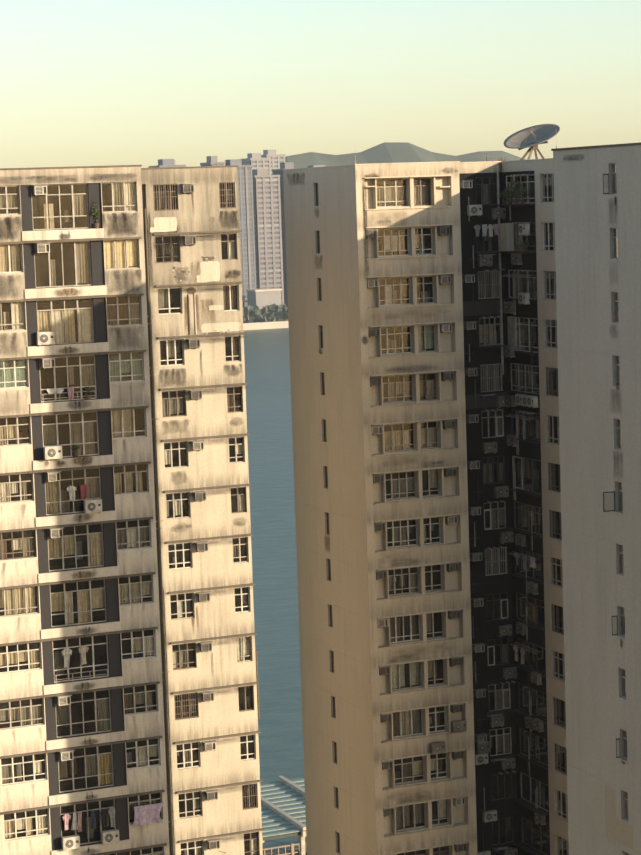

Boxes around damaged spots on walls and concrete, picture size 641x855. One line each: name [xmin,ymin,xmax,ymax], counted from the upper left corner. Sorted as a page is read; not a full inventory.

water stain [0,218,14,238]
water stain [103,214,132,232]